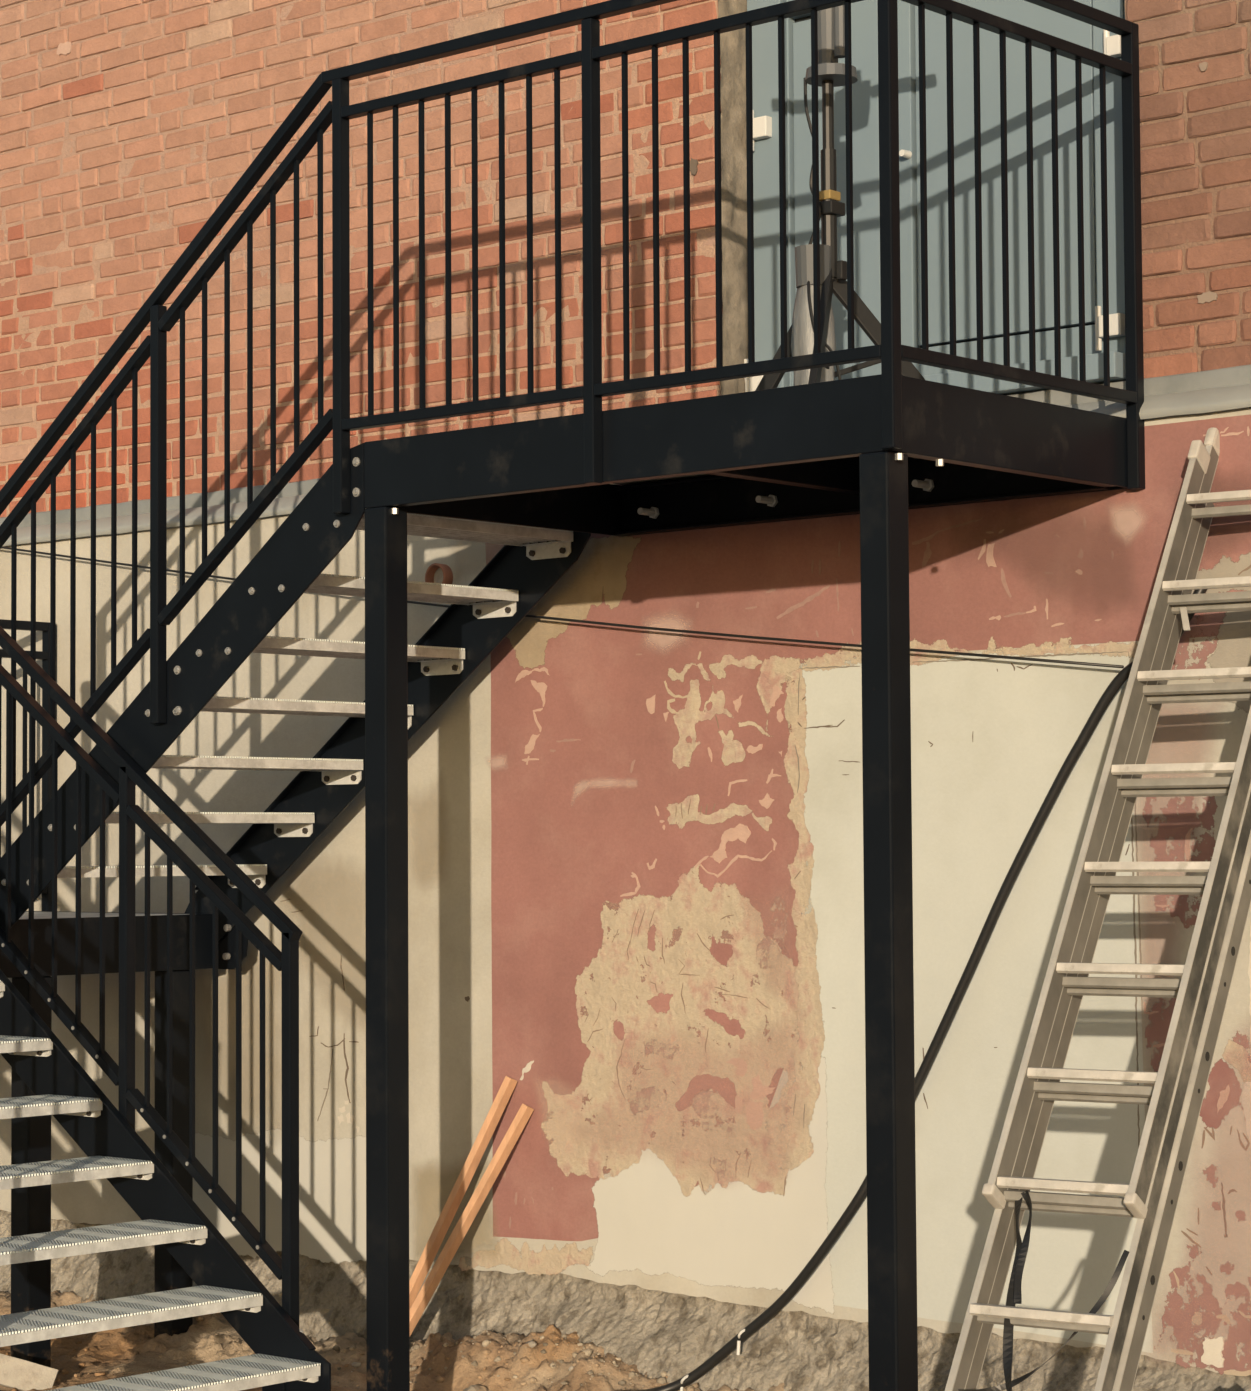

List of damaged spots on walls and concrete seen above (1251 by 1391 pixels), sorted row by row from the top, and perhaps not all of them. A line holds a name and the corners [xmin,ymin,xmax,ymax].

peeling [506,535,641,765]
peeling [910,636,1137,666]
peeling [541,641,861,1197]
peeling [1217,1085,1230,1111]